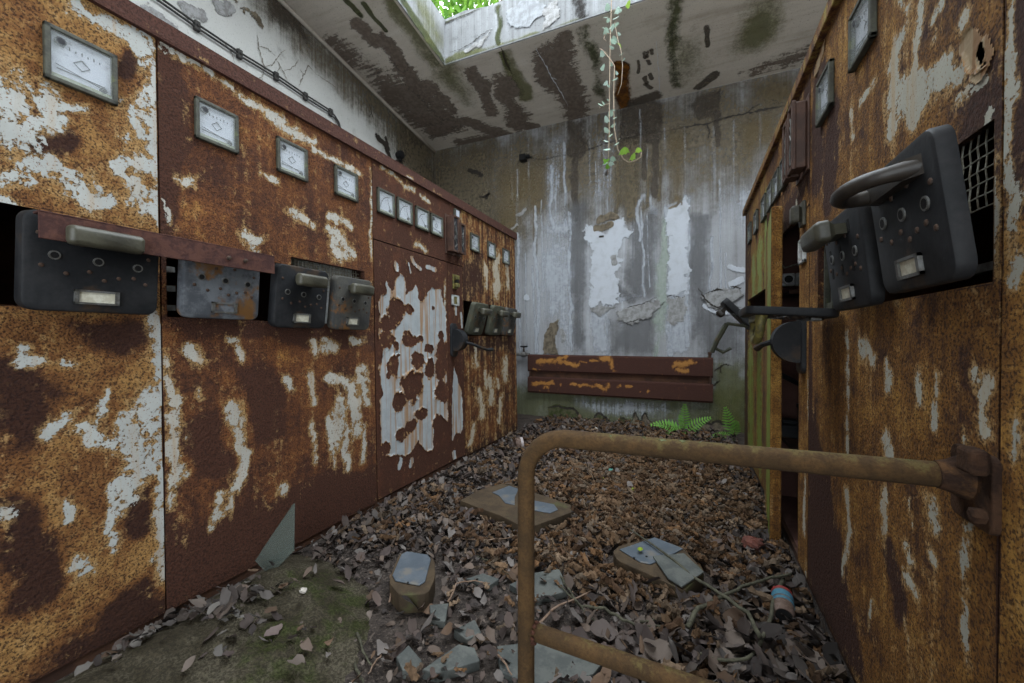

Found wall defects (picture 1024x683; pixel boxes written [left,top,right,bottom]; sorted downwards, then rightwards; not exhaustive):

leakage [256,0,797,357]
peeling [584,211,634,316]
peeling [664,197,692,326]
leakage [583,401,666,415]